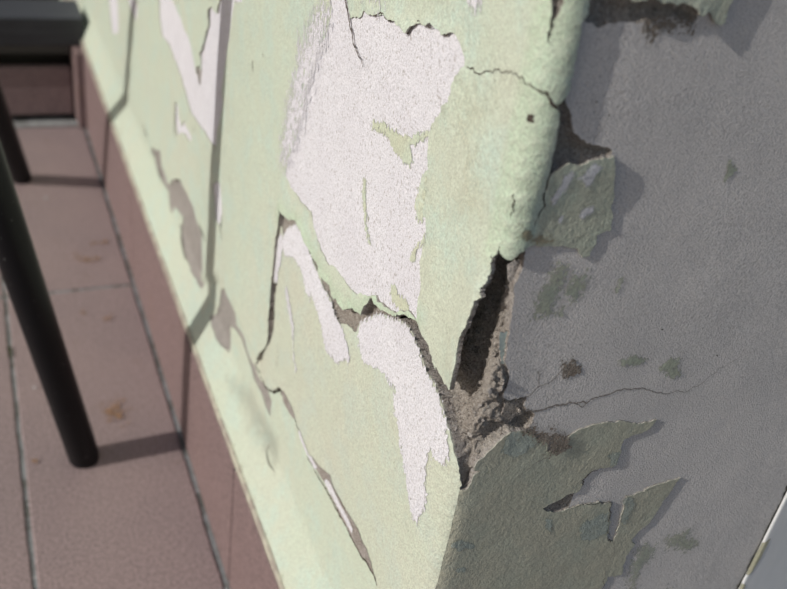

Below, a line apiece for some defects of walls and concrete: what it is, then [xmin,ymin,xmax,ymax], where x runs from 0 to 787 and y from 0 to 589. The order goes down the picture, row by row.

flaking render [152,148,204,289]
peeling [160,0,242,145]
peeling [286,0,465,332]
crack [467,66,566,109]
flaking render [550,99,612,170]
flaking render [584,0,697,28]
flaking render [211,288,271,412]
flaking render [449,254,539,488]
spalling [558,356,582,380]
crack [526,352,751,412]
crack [308,459,377,586]
flaking render [543,493,574,512]